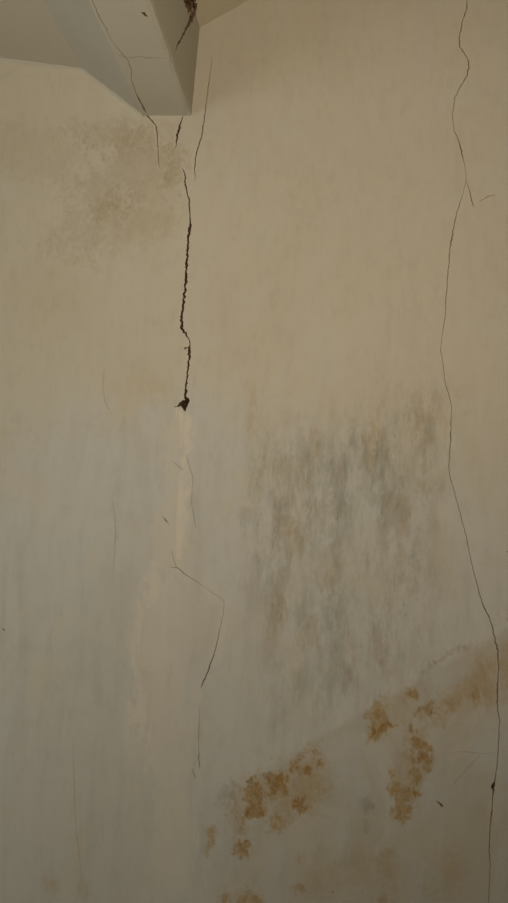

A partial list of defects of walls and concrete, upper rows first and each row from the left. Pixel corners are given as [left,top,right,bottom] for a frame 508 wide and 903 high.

crack [92,0,212,411]
crack [440,2,500,903]
crack [172,553,224,777]